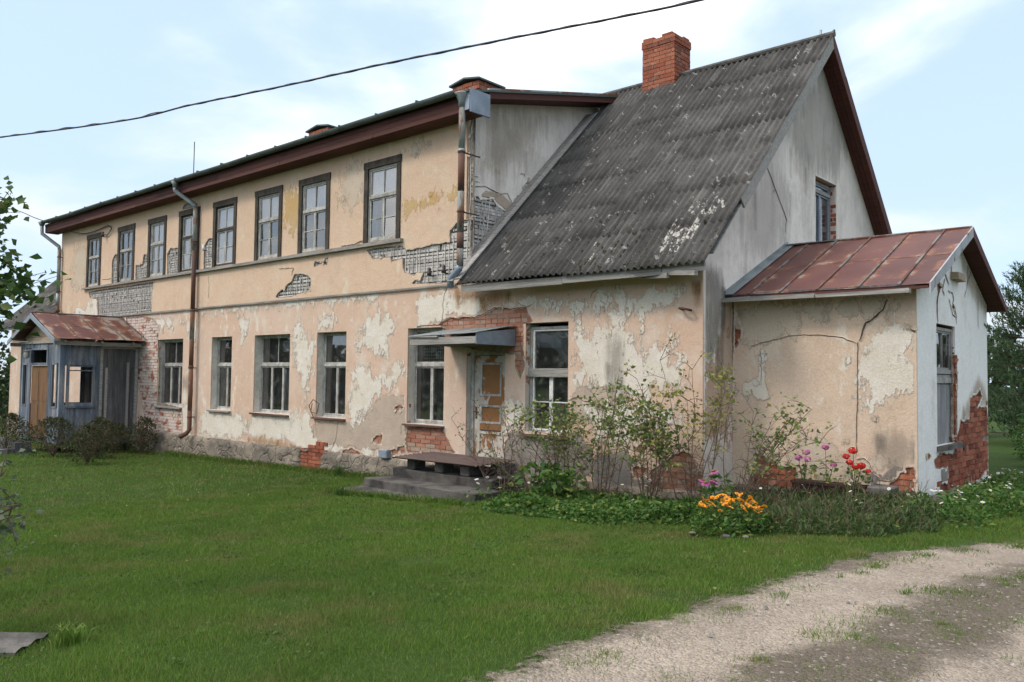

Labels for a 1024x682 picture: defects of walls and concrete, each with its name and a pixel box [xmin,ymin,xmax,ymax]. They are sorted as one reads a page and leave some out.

flaking render [70,245,455,468]
peeling [367,119,918,493]
crack [732,299,899,482]
flaking render [925,347,989,494]